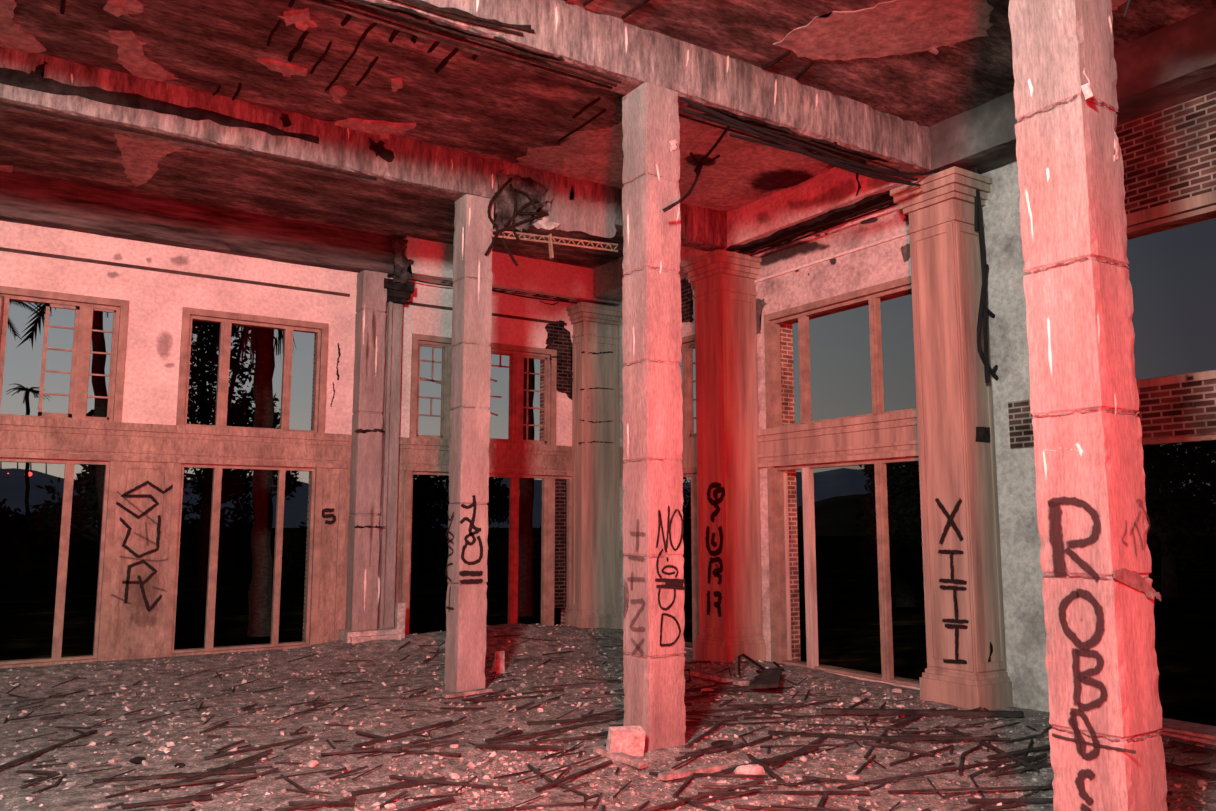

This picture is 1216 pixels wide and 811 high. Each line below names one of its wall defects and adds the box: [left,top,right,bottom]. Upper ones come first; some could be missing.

spalling [0,0,319,144]
peeling [762,0,994,80]
peeling [0,102,377,187]
peeling [257,0,624,266]
peeling [669,104,899,212]
flaking render [545,320,573,400]